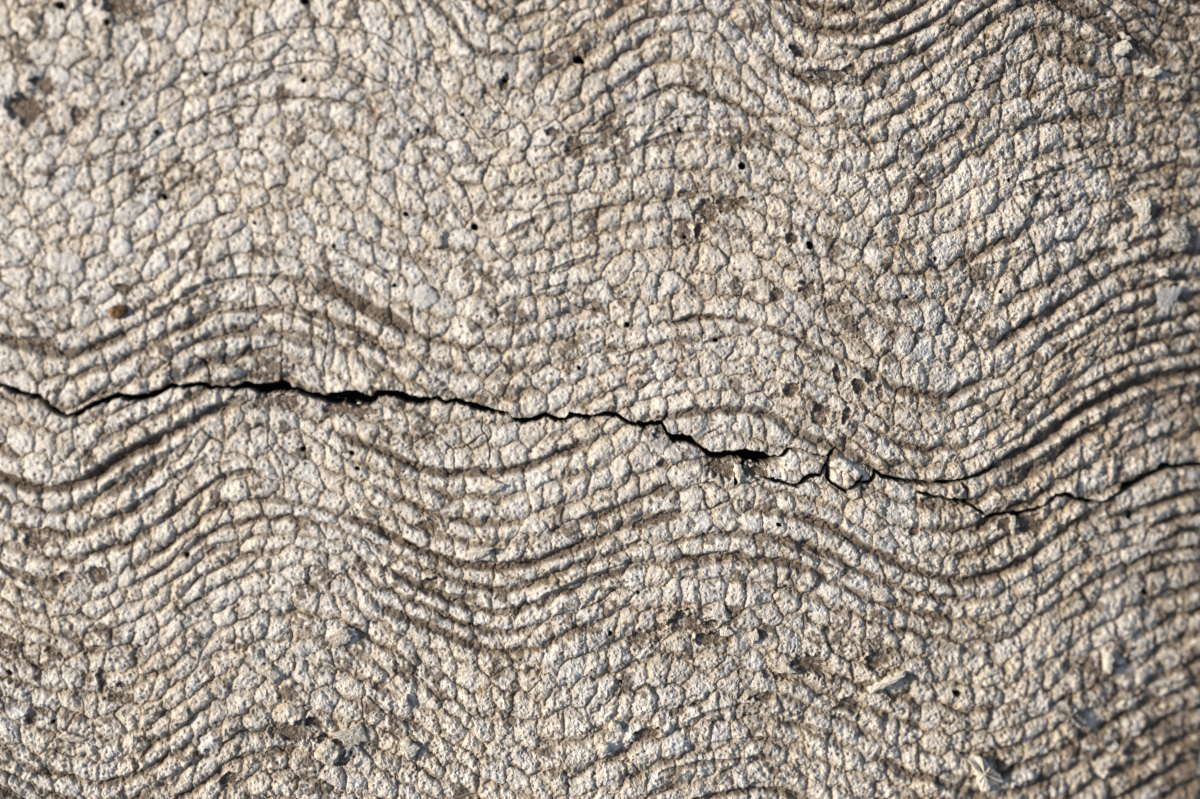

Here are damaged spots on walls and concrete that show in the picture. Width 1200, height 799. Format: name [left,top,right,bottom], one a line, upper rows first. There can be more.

crack [0,0,476,294]
crack [1032,0,1200,292]
crack [0,231,116,337]
crack [0,446,124,542]
crack [0,576,126,799]
crack [209,591,347,771]
crack [307,684,498,799]
crack [411,471,769,799]
crack [701,556,824,659]
crack [773,638,925,799]
crack [918,707,1020,799]
crack [1025,586,1200,799]